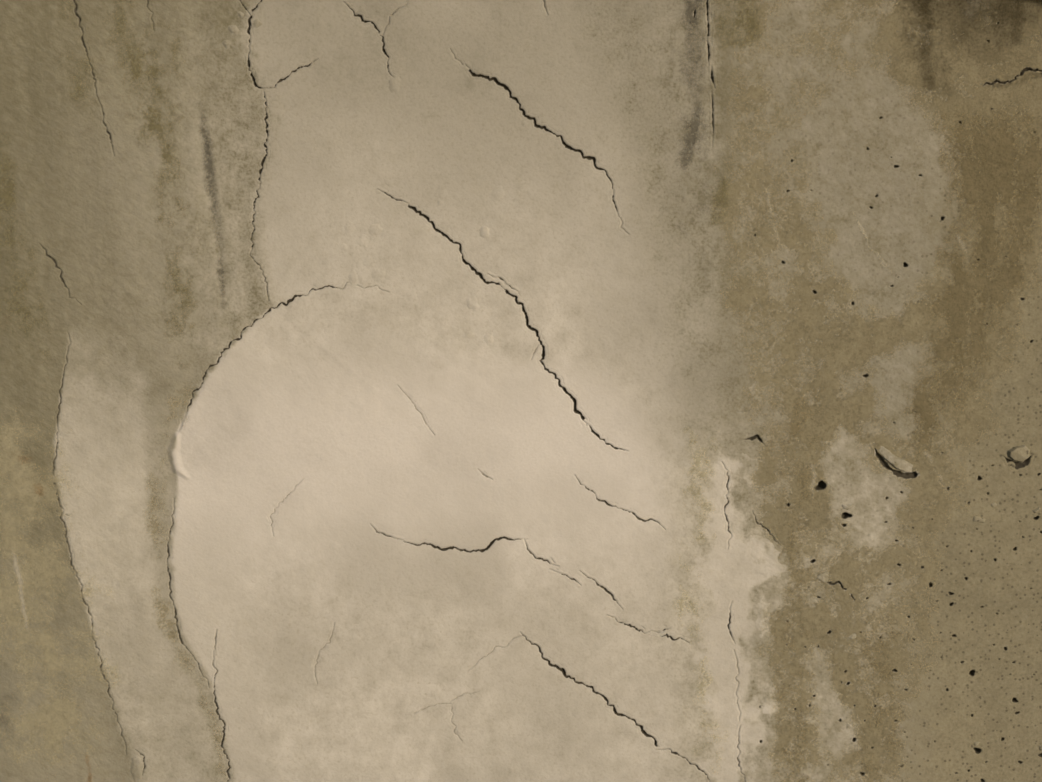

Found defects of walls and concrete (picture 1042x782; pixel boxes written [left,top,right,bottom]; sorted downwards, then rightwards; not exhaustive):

leakage [0,409,119,767]
leakage [108,0,190,224]
leakage [165,247,196,336]
leakage [200,110,225,305]
crack [174,0,391,433]
crack [375,186,630,455]
crack [368,522,692,646]
crack [447,47,631,238]
crack [571,473,668,532]
leakage [674,0,1042,782]
spalling [870,446,920,482]
crack [413,599,748,782]